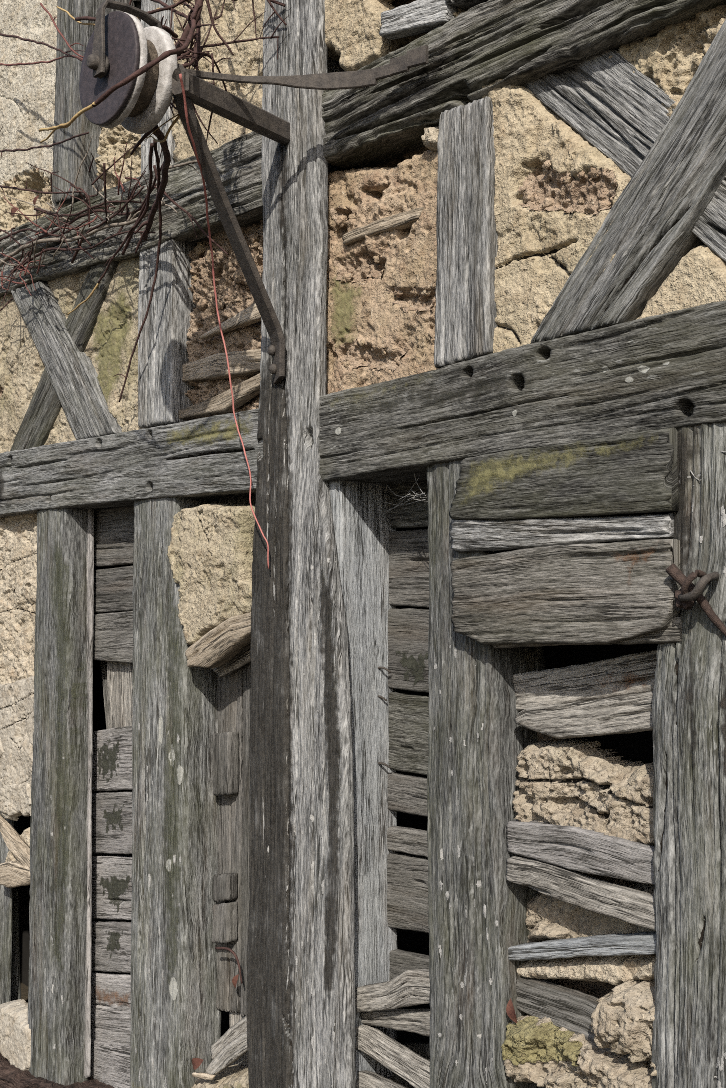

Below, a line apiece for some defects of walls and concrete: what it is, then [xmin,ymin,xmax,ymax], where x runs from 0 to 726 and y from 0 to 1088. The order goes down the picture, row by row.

spalling [517,160,617,216]
crack [496,240,578,271]